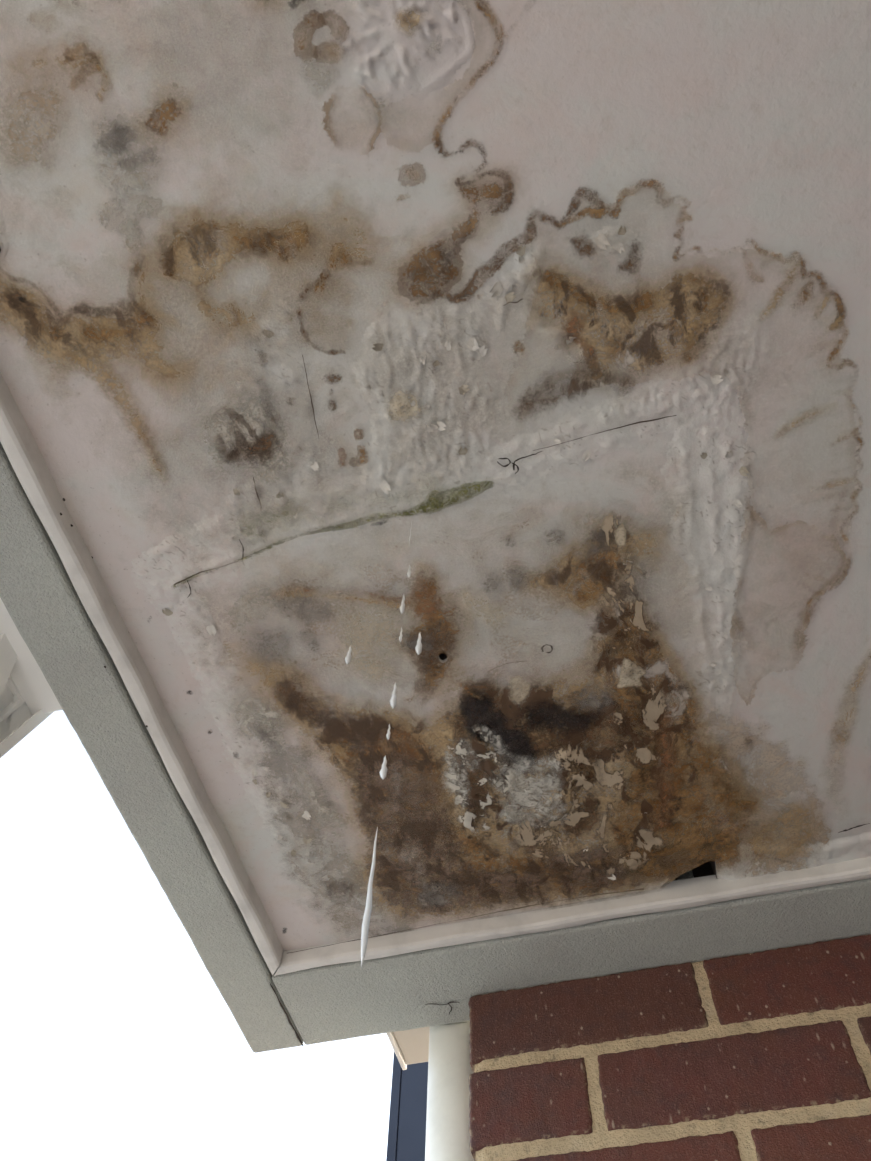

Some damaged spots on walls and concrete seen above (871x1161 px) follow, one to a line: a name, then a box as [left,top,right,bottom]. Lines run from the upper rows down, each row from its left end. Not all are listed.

water stain [0,261,184,475]
water stain [100,97,182,249]
water stain [160,218,312,327]
water stain [205,399,287,482]
water stain [322,97,335,141]
water stain [297,217,368,355]
water stain [397,107,659,303]
water stain [520,269,728,415]
water stain [751,241,854,368]
crack [174,539,292,598]
water stain [234,513,831,931]
peeling [445,547,683,880]